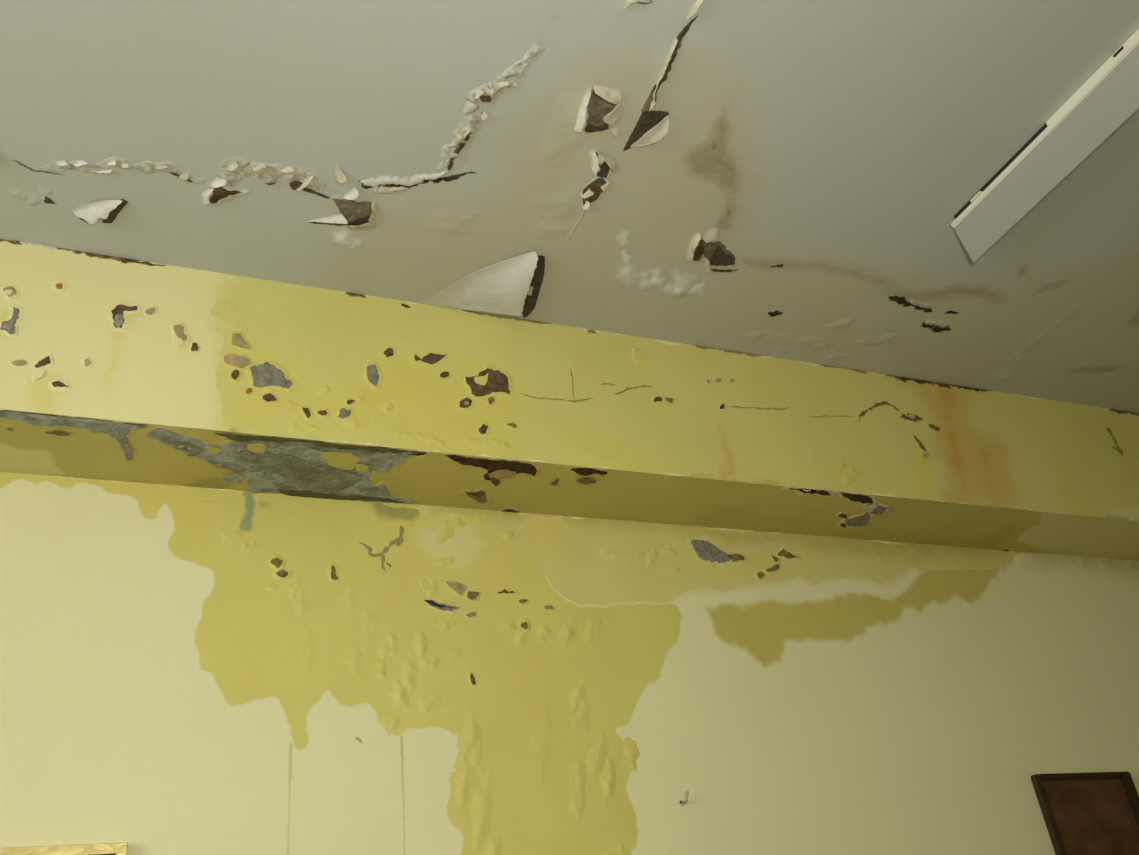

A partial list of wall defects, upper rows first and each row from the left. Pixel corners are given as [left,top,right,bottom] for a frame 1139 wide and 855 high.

peeling [566,0,703,241]
peeling [39,156,379,231]
peeling [425,252,545,318]
spalling [687,227,740,273]
leakage [17,367,79,418]
spalling [0,409,422,504]
spalling [411,351,515,412]
crack [693,345,763,358]
crack [727,364,991,458]
corrosion [876,373,1029,510]
crack [358,526,405,572]
leakage [0,420,1139,855]